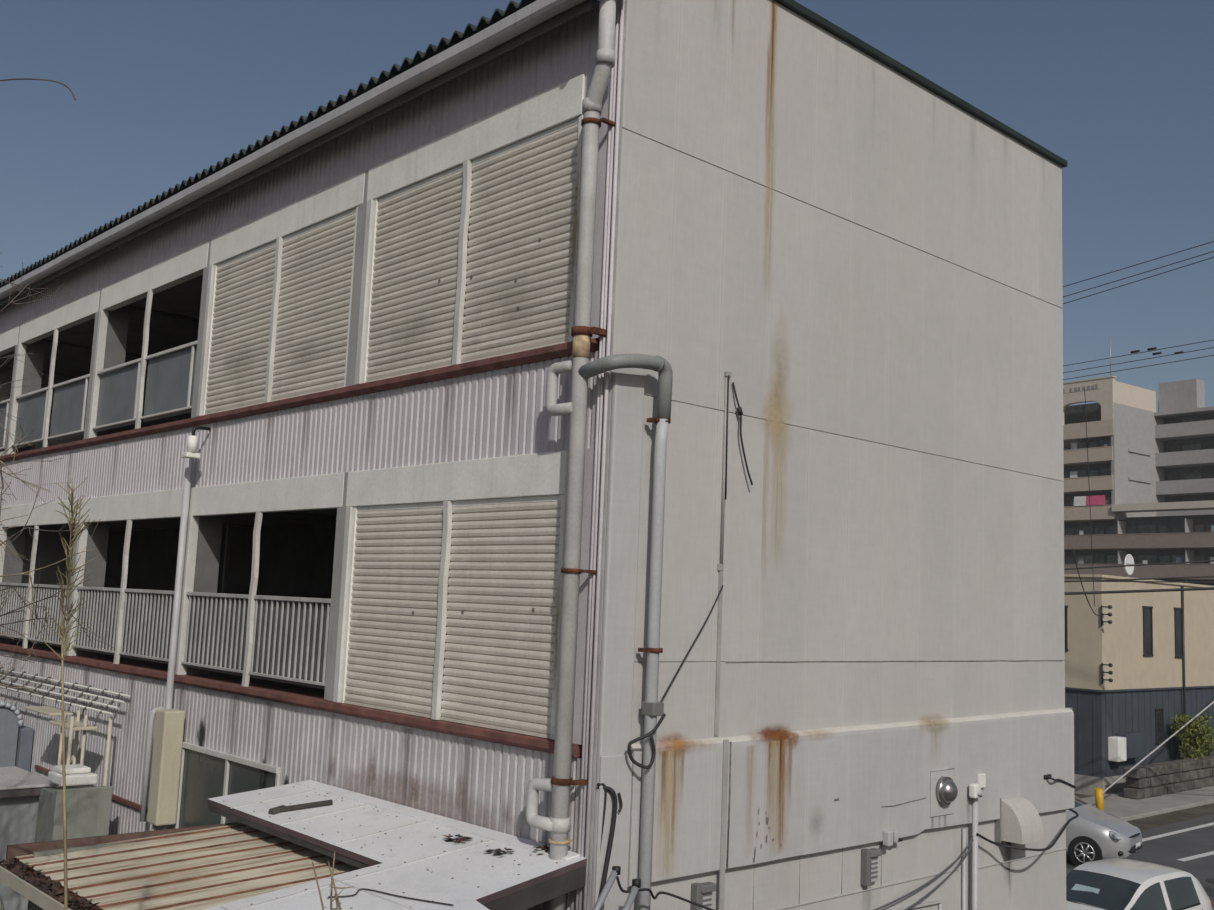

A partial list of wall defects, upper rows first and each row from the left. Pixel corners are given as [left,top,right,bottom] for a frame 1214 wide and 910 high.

rust [768,0,776,85]
rust [762,729,796,800]